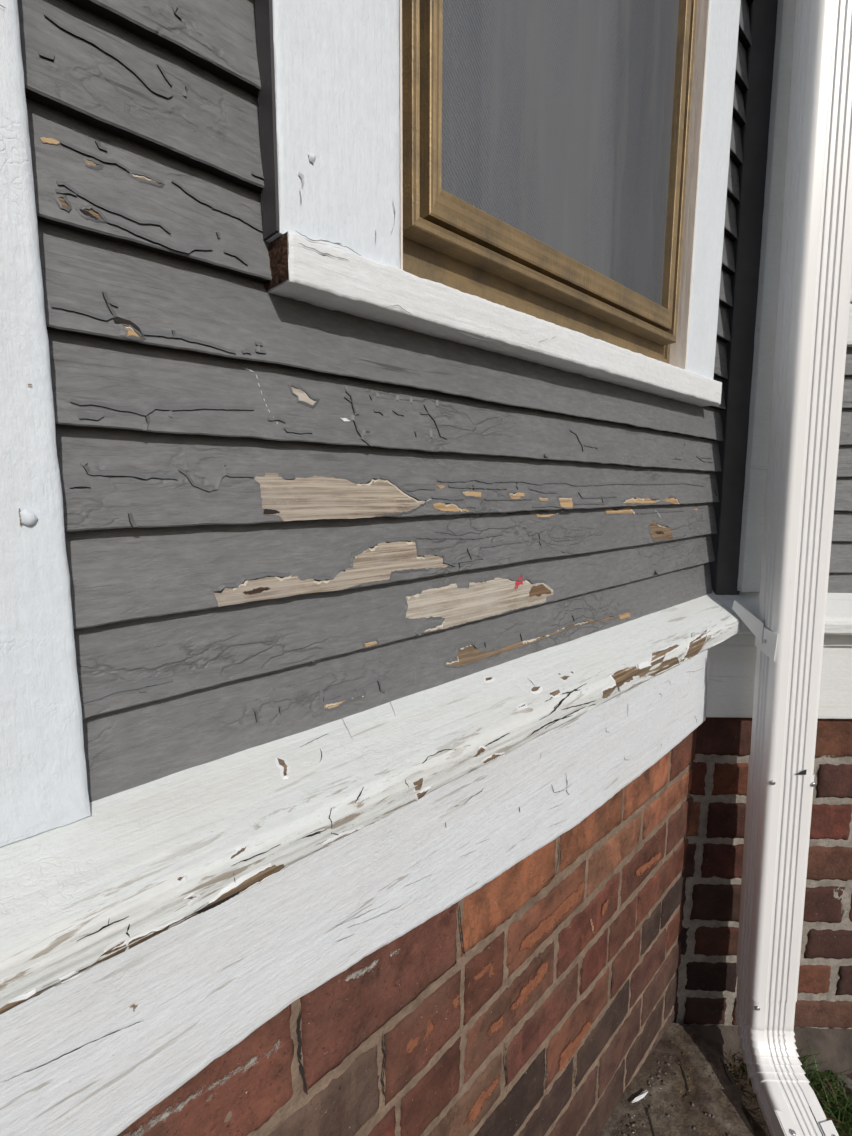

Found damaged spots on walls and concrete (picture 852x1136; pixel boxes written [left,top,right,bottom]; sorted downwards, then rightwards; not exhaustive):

crack [38,13,188,99]
crack [59,139,130,172]
crack [55,179,263,265]
crack [51,292,118,321]
crack [70,398,313,434]
peeling [254,473,483,521]
peeling [536,494,574,520]
peeling [606,495,680,516]
peeling [211,537,553,635]
peeling [601,627,709,698]
peeling [0,863,288,1014]
crack [5,1021,142,1082]